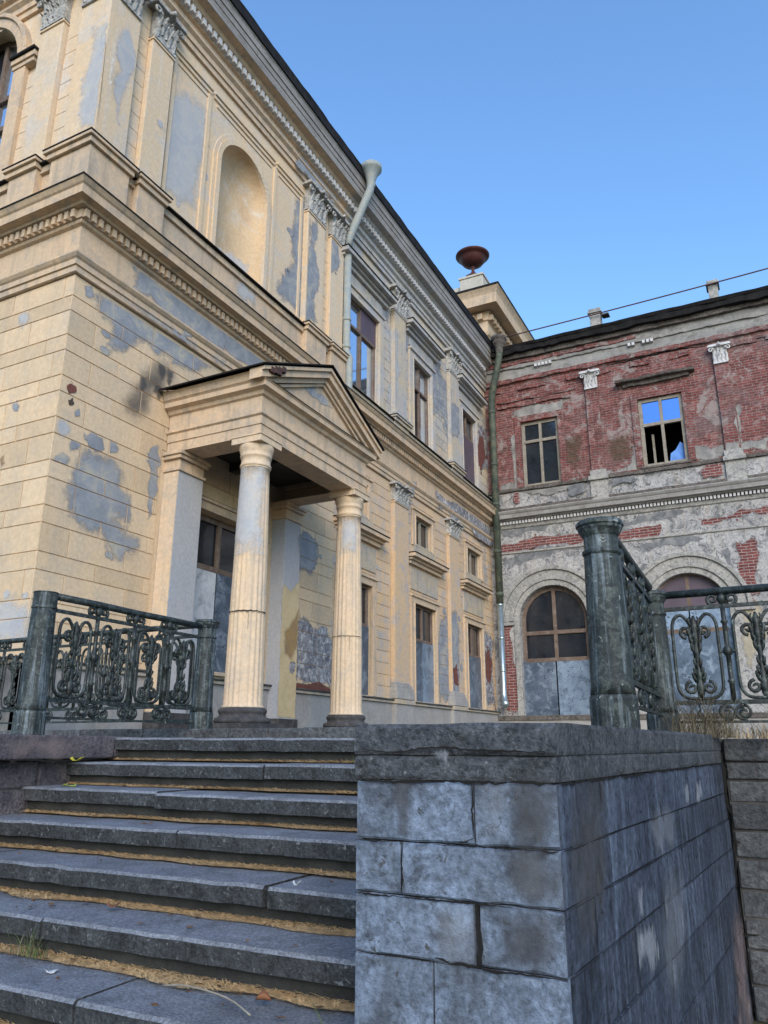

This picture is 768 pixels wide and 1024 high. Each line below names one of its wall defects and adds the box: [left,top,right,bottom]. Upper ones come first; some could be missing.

peeling [158,95,208,207]
peeling [85,267,287,378]
peeling [219,248,255,303]
peeling [277,200,344,322]
peeling [54,381,139,561]
peeling [299,531,322,574]
peeling [289,616,332,691]
flaking render [484,622,518,715]
flaking render [722,538,767,668]
crack [435,904,511,974]